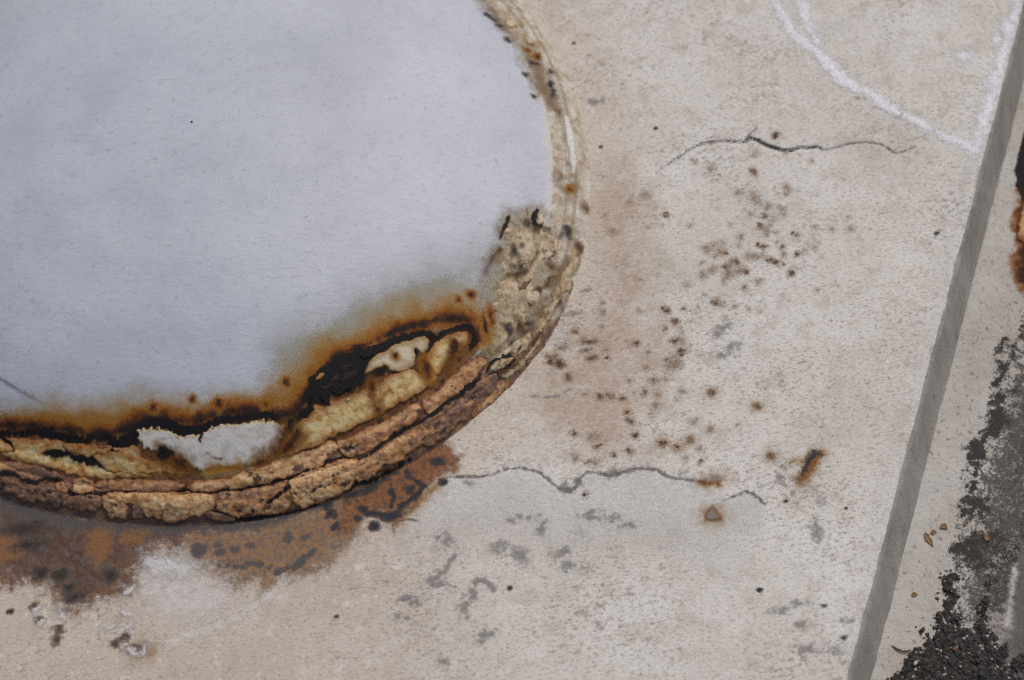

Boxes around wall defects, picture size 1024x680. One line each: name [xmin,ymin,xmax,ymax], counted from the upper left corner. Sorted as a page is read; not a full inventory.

corrosion [555,169,579,194]
peeling [563,115,577,175]
crack [656,128,915,173]
corrosion [701,184,815,289]
peeling [0,218,587,523]
corrosion [0,241,591,488]
corrosion [530,283,691,465]
corrosion [659,418,704,464]
corrosion [766,449,824,485]
leakage [948,315,1024,630]
corrosion [0,443,460,615]